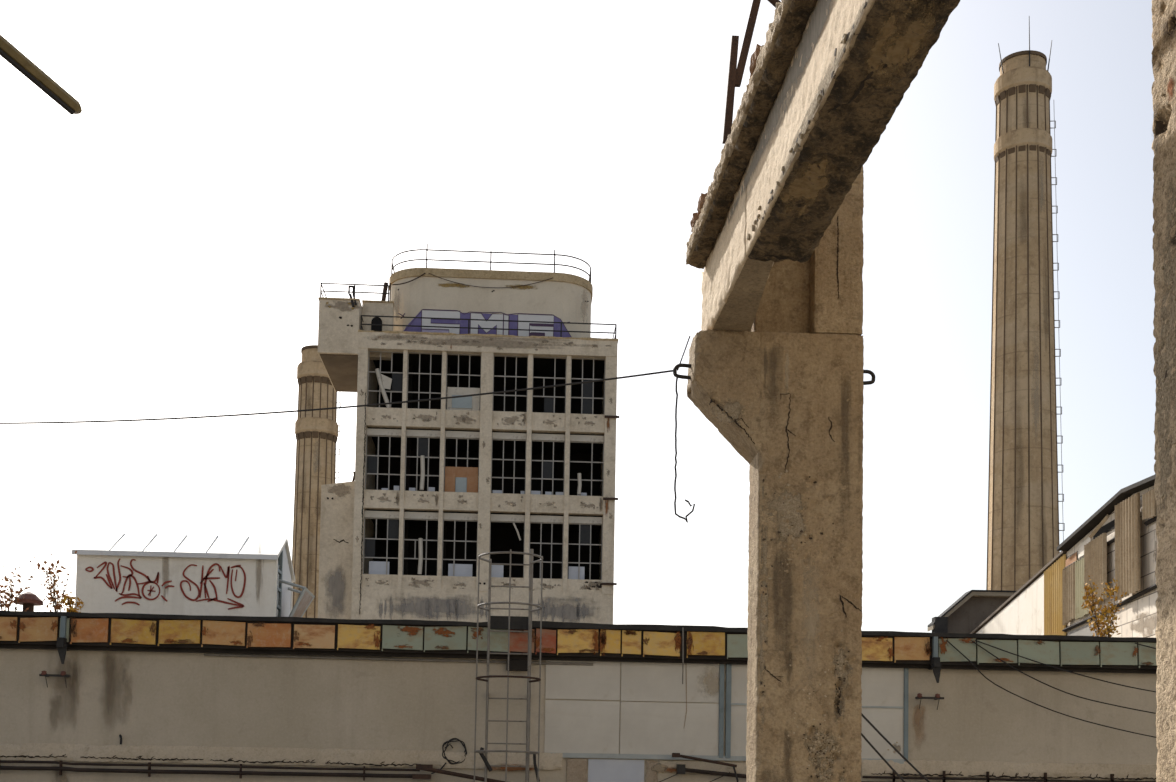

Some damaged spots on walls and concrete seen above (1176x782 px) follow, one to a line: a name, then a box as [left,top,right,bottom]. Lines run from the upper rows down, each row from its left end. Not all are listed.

spalling [747,0,868,240]
crack [709,398,755,444]
crack [780,393,796,473]
water stain [379,598,488,618]
water stain [535,598,589,622]
rust [395,626,455,649]
rust [593,629,607,655]